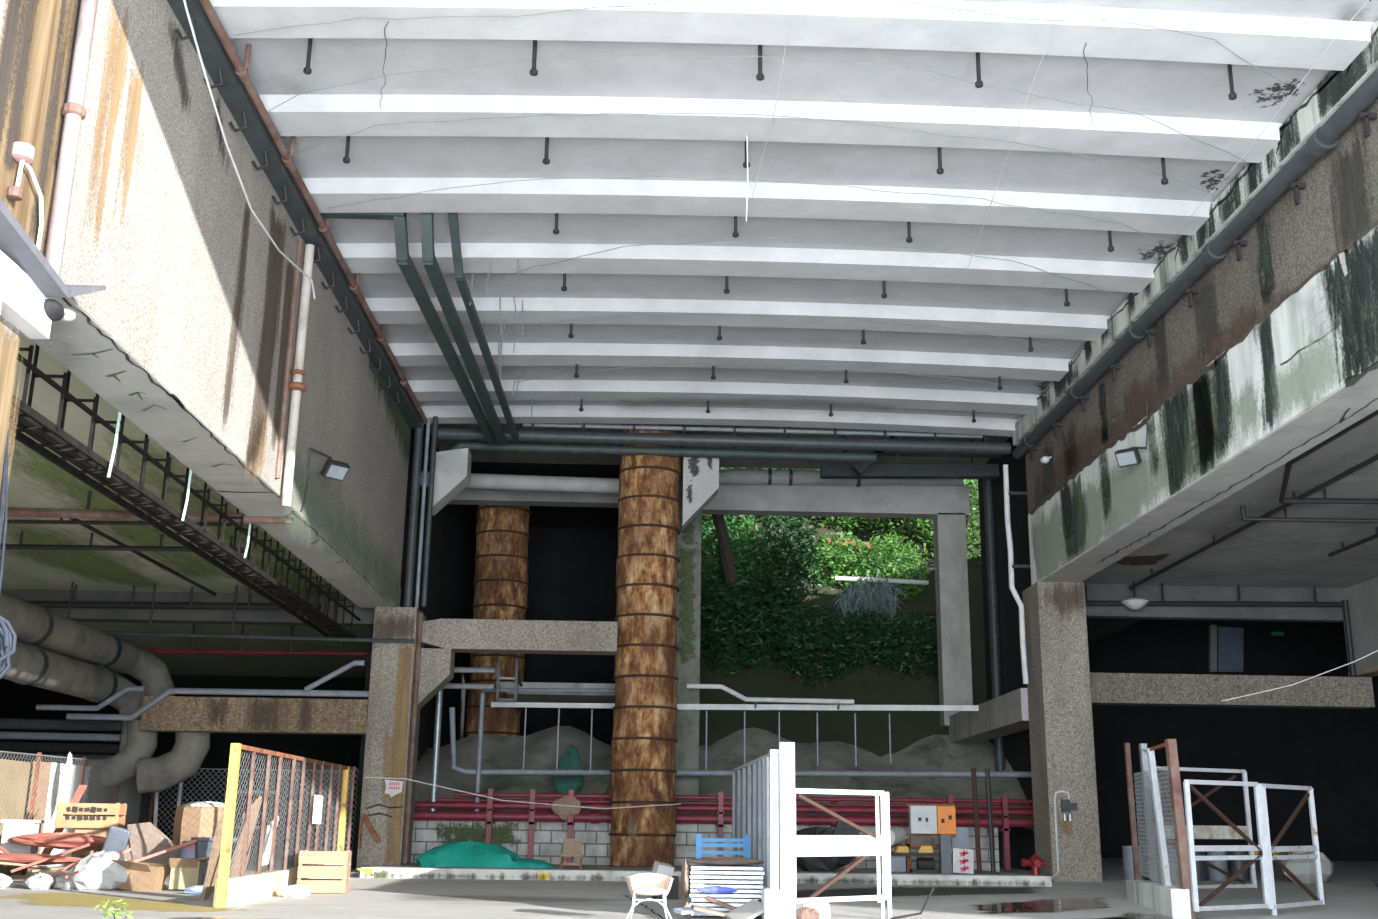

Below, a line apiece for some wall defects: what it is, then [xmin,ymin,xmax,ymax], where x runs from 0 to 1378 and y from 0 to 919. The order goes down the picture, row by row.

crack [380,21,389,109]
crack [1083,43,1093,116]
damp [1154,282,1231,494]
damp [1254,216,1280,428]
crack [1280,326,1338,365]
damp [1322,141,1378,384]